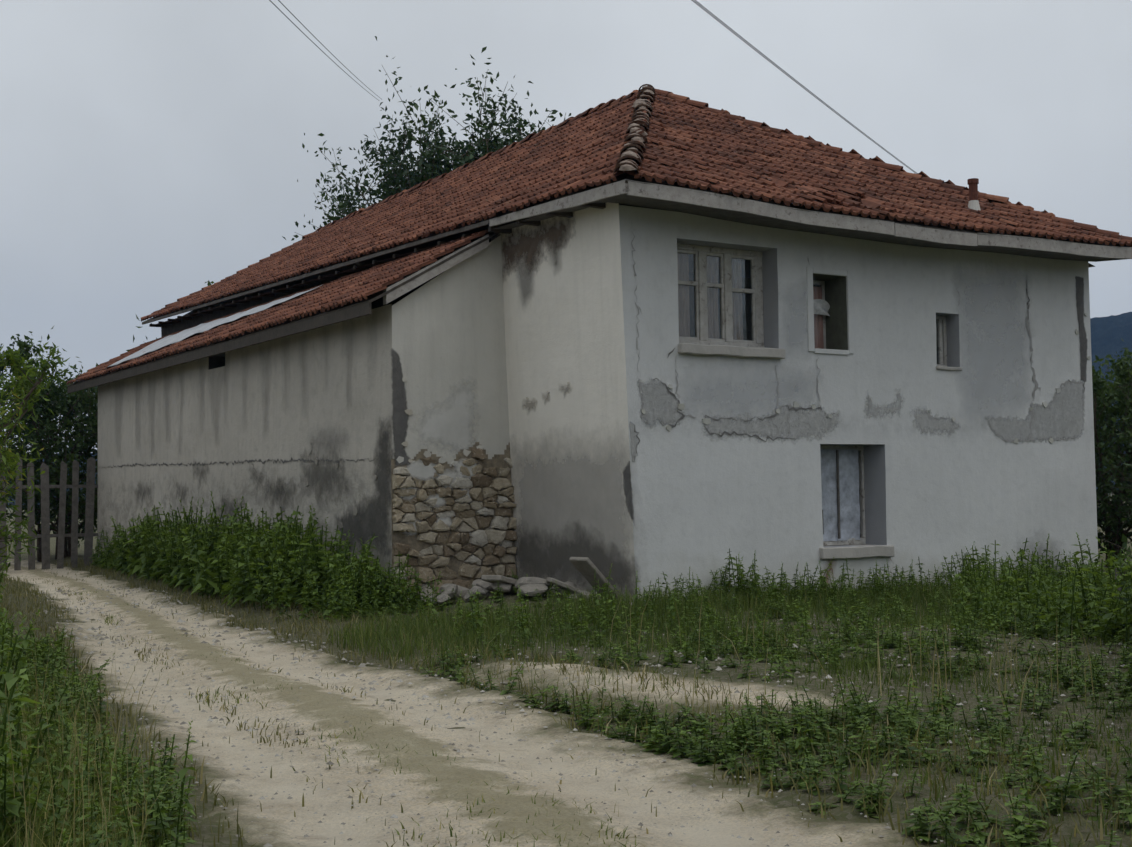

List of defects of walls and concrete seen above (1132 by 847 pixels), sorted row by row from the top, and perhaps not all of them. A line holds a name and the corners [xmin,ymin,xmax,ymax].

peeling [338,349,518,599]
leakage [501,218,571,271]
crack [631,222,642,371]
spalling [623,378,839,521]
spalling [915,409,959,435]
crack [1025,280,1041,431]
spalling [986,277,1091,444]